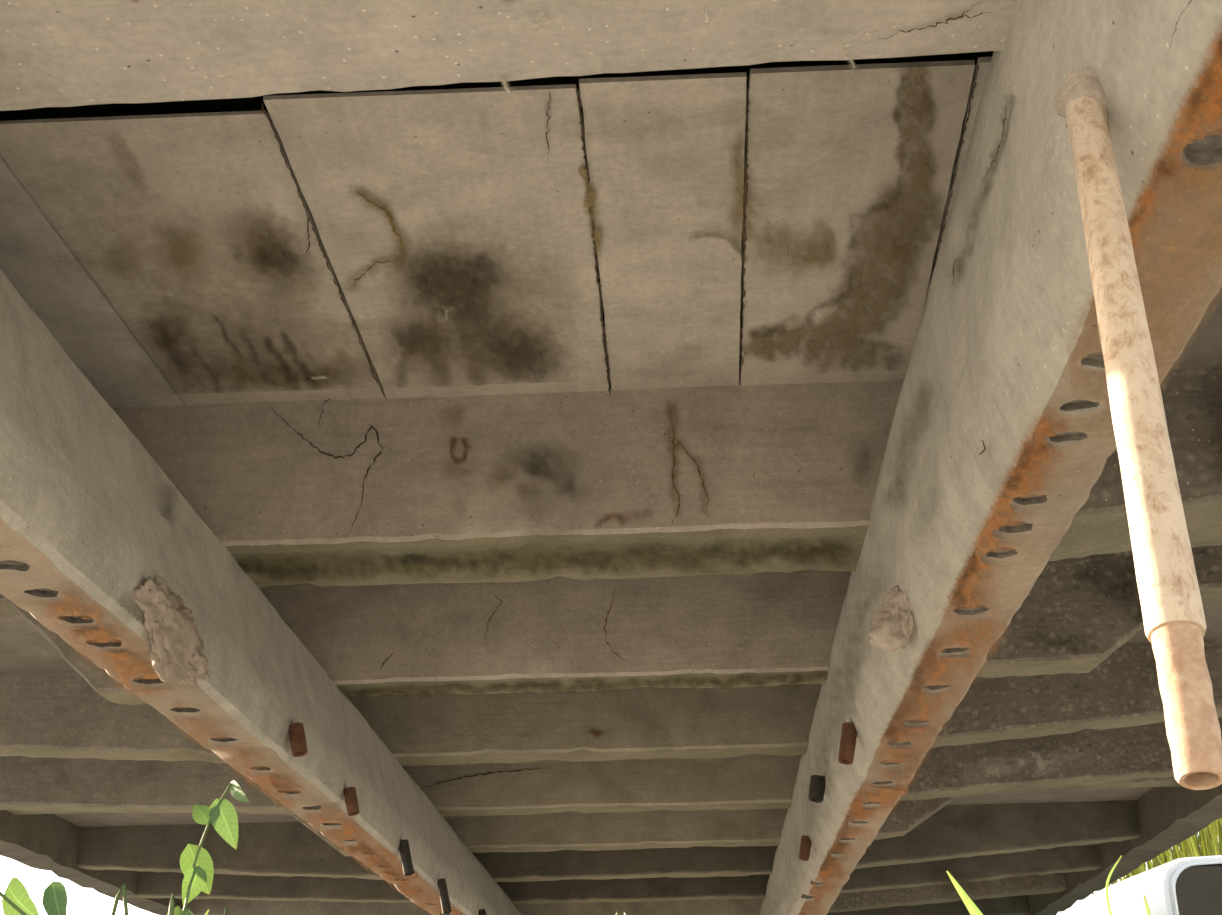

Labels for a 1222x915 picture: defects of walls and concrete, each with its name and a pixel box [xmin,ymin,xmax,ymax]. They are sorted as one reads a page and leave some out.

crack [881,0,994,40]
rust [1128,32,1222,246]
water stain [157,323,340,390]
water stain [246,222,297,283]
water stain [401,257,547,372]
crack [545,89,611,396]
crack [740,77,750,372]
water stain [743,66,939,370]
crack [269,399,384,536]
rust [52,597,160,692]
rust [801,418,1065,915]
rust [318,818,462,915]